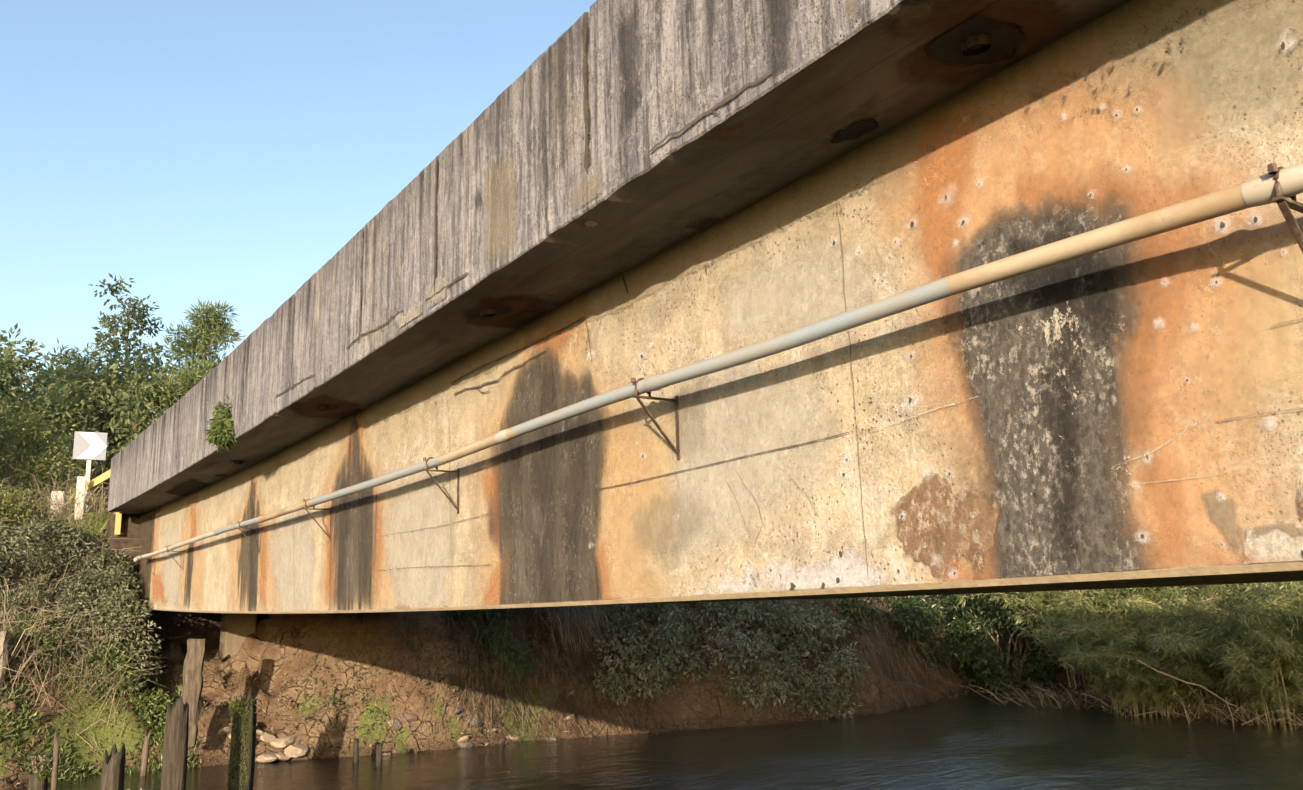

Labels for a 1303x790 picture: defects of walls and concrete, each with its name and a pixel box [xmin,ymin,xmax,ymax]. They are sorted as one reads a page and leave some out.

water stain [957,193,1125,273]
rust [898,99,1204,278]
water stain [238,479,312,611]
rust [292,396,400,609]
water stain [332,414,446,610]
crack [450,317,592,395]
water stain [489,353,604,604]
rust [466,296,678,605]
spalling [890,468,1000,577]
rust [932,293,981,420]
water stain [957,243,1149,578]
rust [1110,214,1245,566]